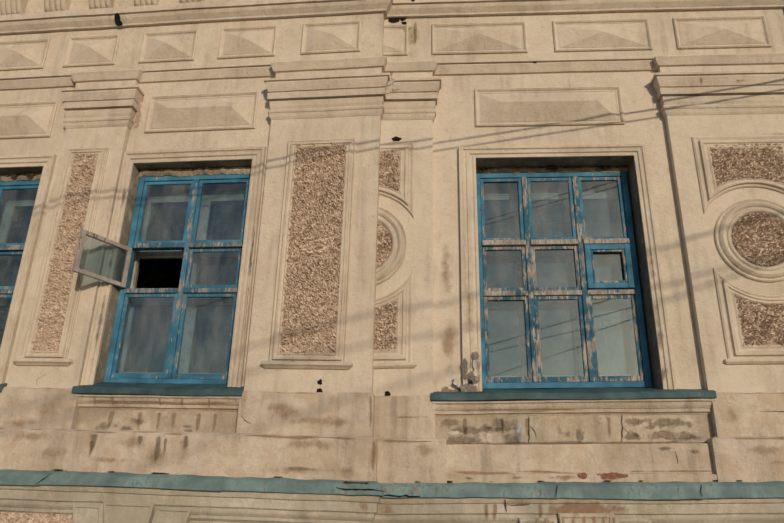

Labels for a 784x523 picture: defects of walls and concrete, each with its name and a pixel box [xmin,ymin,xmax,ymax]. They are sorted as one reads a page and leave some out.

spalling [438,351,480,392]
damp [151,413,167,460]
spalling [626,418,695,440]
flaking render [597,472,629,482]